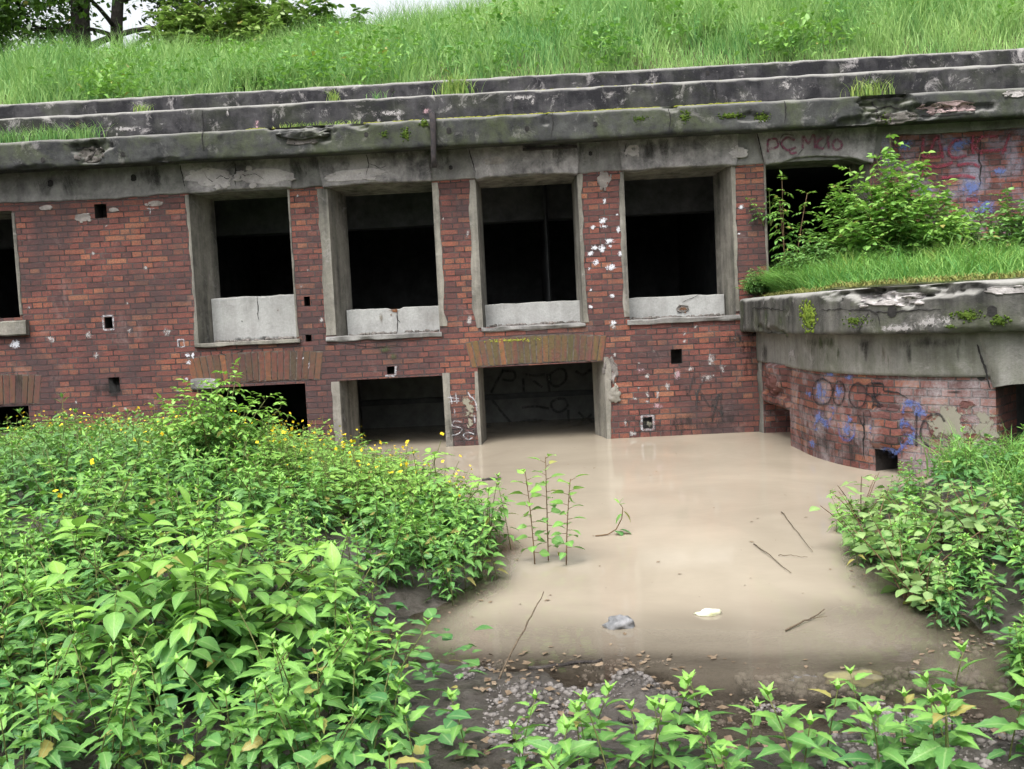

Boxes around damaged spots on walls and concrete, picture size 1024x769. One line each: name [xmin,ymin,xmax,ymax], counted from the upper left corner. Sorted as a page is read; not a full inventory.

spalling [875,101,976,125]
spalling [74,146,104,163]
crack [180,166,263,186]
spalling [859,291,926,308]
spalling [984,285,1024,295]
spalling [602,356,621,403]